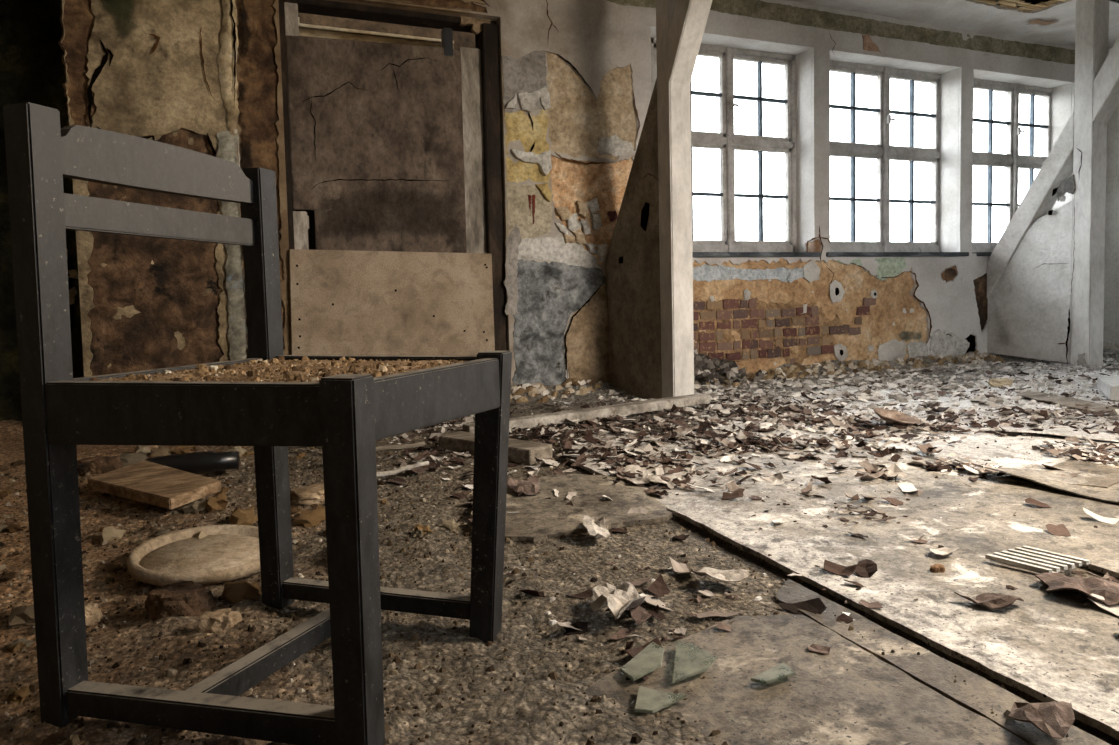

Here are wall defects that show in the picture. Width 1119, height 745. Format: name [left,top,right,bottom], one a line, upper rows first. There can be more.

flaking render [974,0,1066,11]
crack [87,40,114,129]
crack [207,133,216,157]
crack [304,58,441,189]
flaking render [501,50,640,315]
flaking render [640,202,650,231]
flaking render [1048,174,1075,215]
flaking render [693,257,988,373]